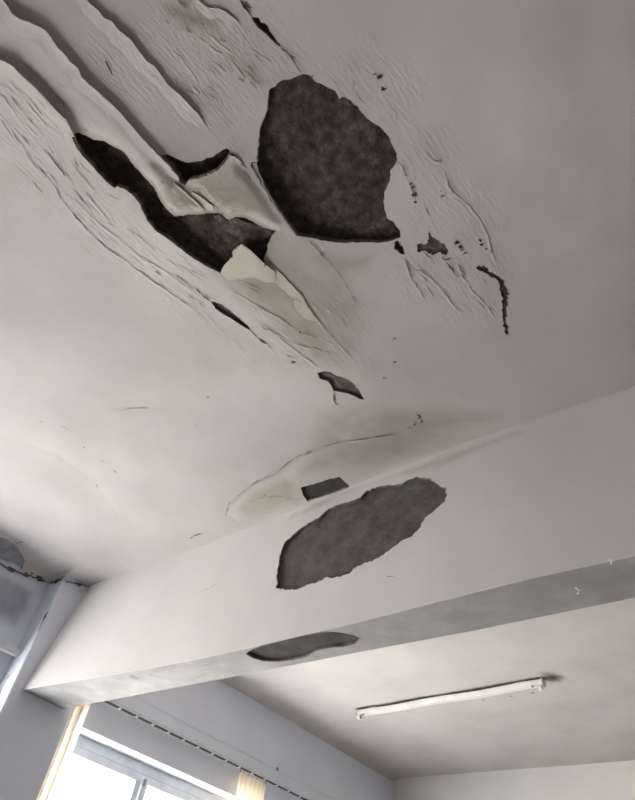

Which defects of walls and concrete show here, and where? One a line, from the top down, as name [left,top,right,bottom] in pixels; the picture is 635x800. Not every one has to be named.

spalling [0,0,405,324]
peeling [417,232,467,261]
crack [396,154,509,337]
spalling [318,371,364,400]
spalling [276,476,447,590]
crack [0,563,89,587]
spalling [246,632,360,662]